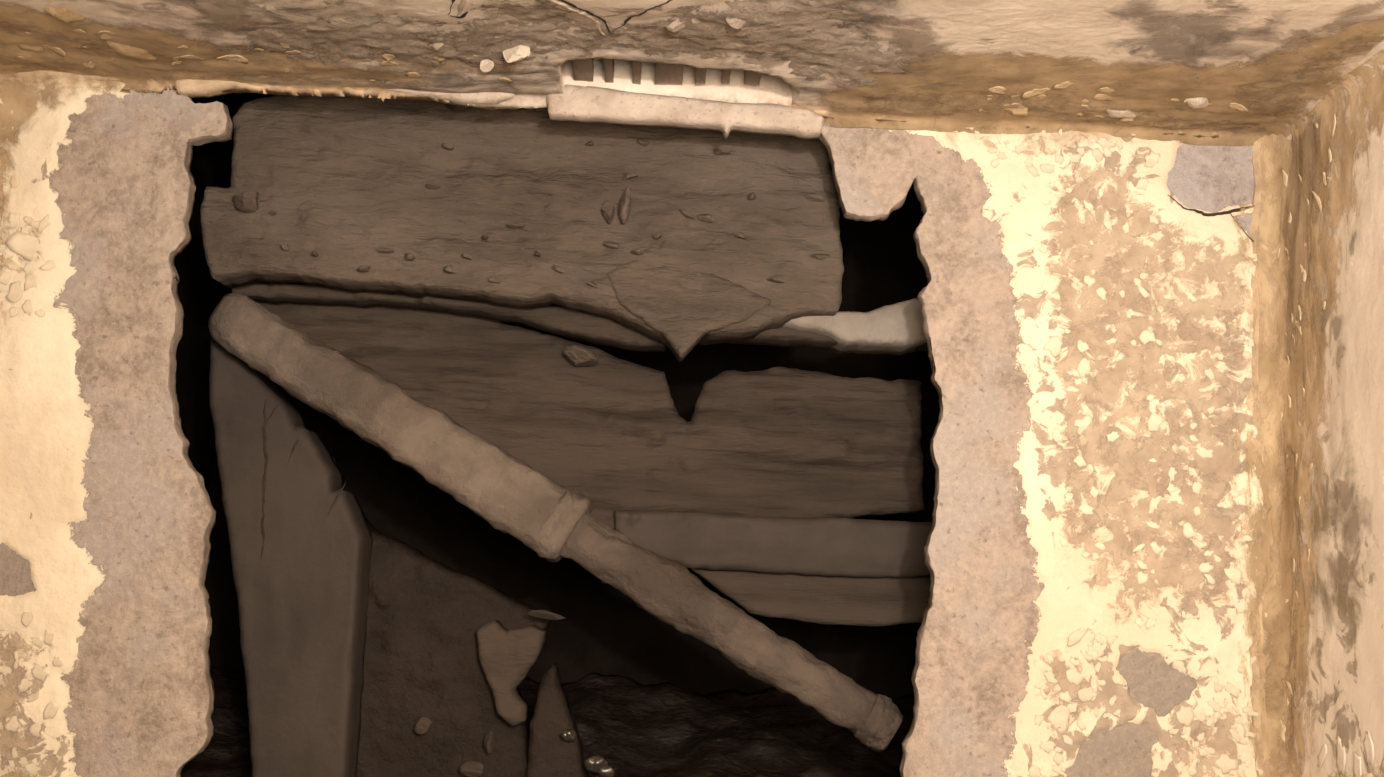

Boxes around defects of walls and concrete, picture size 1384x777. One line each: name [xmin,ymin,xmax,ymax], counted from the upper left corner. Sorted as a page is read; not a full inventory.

crack [448,0,468,19]
crack [548,0,672,35]
leakage [863,0,949,62]
leakage [1113,4,1246,66]
leakage [1291,0,1384,47]
peeling [1281,114,1336,223]
peeling [1285,305,1302,366]
leakage [1332,317,1344,367]
spalling [0,89,274,777]
spalling [500,81,1268,777]
spalling [272,381,774,694]
peeling [1279,681,1292,744]